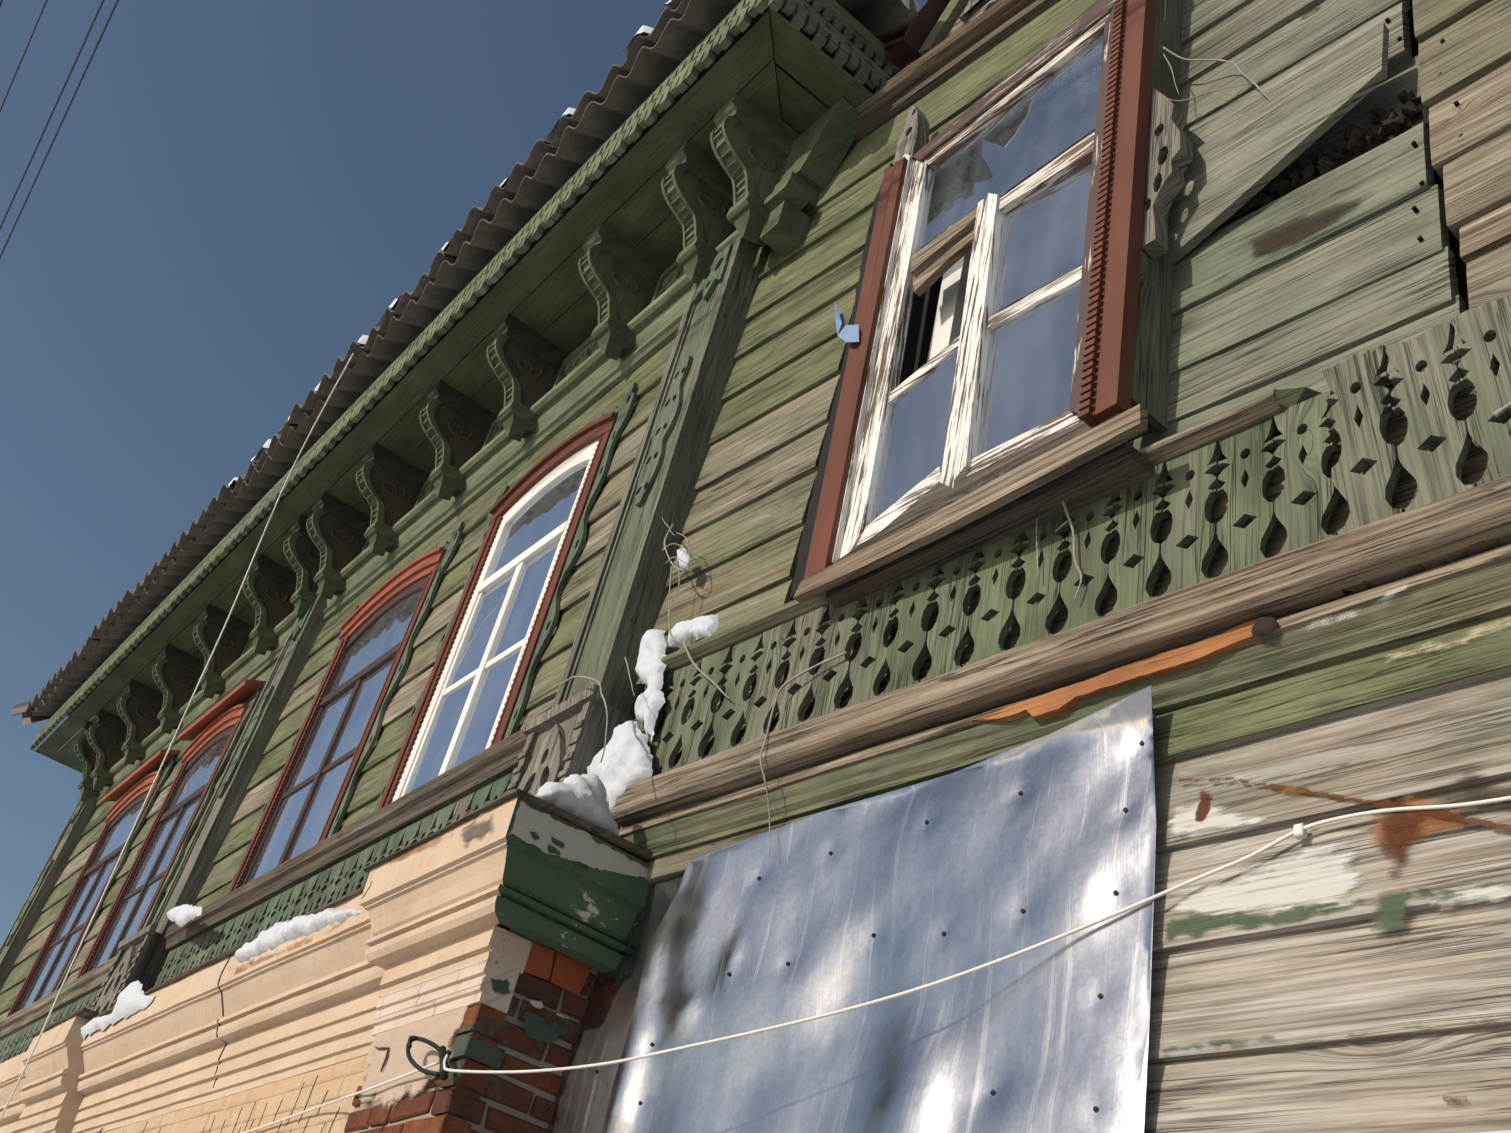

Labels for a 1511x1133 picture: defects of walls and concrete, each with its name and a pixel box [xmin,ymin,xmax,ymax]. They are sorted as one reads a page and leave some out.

peeling [508,801,649,878]
corrosion [1179,777,1511,875]
peeling [1166,899,1363,939]
peeling [1413,888,1455,901]
crack [202,955,340,1133]